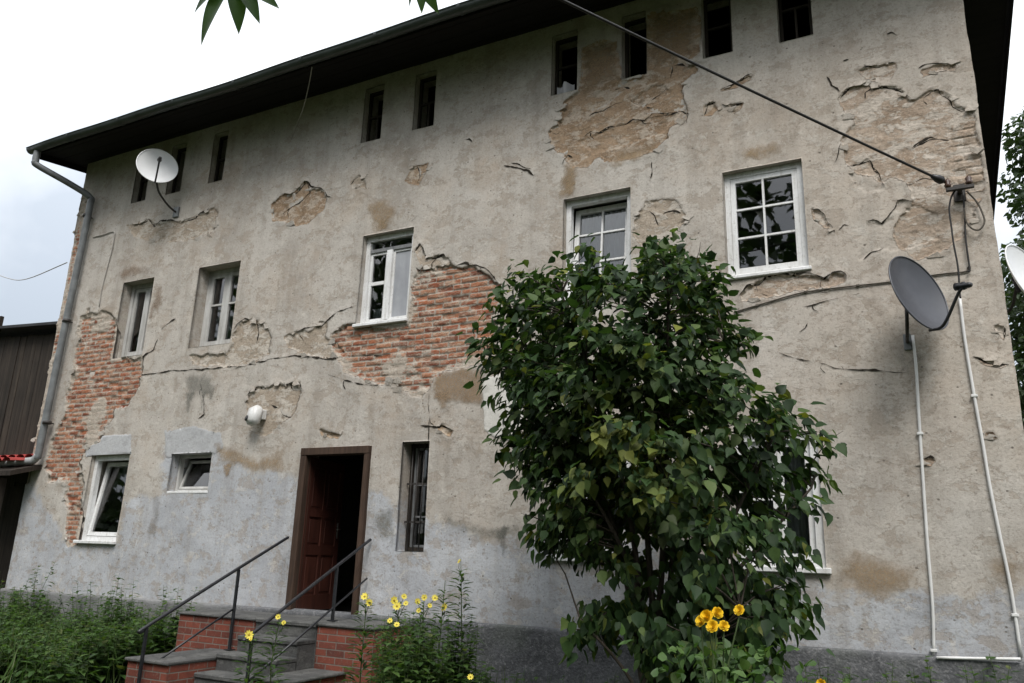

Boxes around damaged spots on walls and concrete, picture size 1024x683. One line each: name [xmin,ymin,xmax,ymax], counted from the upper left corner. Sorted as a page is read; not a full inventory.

flaking render [543,4,702,168]
crack [827,19,970,111]
flaking render [921,59,961,77]
flaking render [269,178,327,227]
flaking render [632,198,693,248]
flaking render [837,62,986,260]
crack [913,137,949,148]
flaking render [26,198,143,547]
crack [130,304,383,419]
flaking render [244,380,302,437]
flaking render [284,245,508,398]
crack [772,350,906,373]